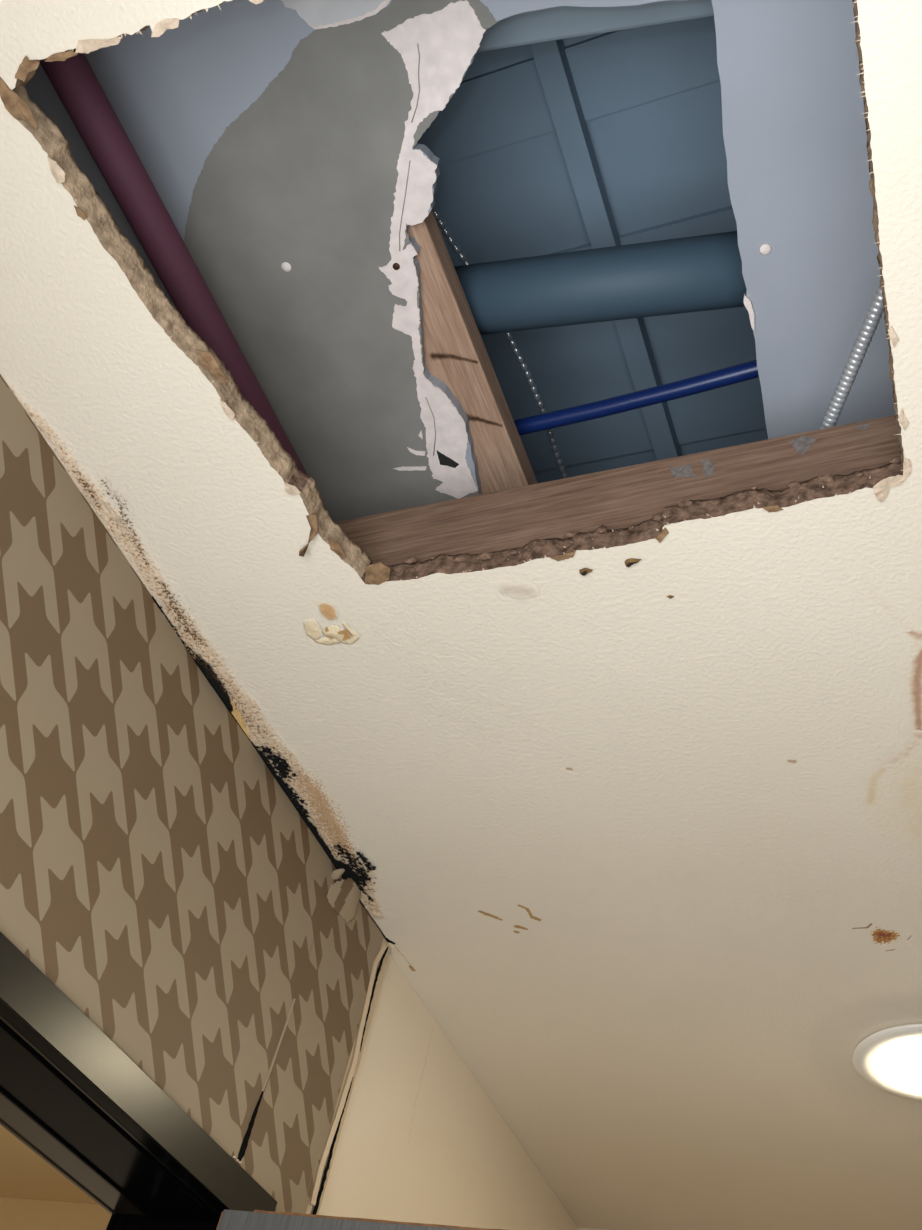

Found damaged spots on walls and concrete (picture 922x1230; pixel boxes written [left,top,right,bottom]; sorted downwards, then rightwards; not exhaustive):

spalling [0,0,911,585]
damp [72,471,149,565]
flaking render [3,375,395,923]
damp [152,581,388,942]
crack [306,937,416,1215]